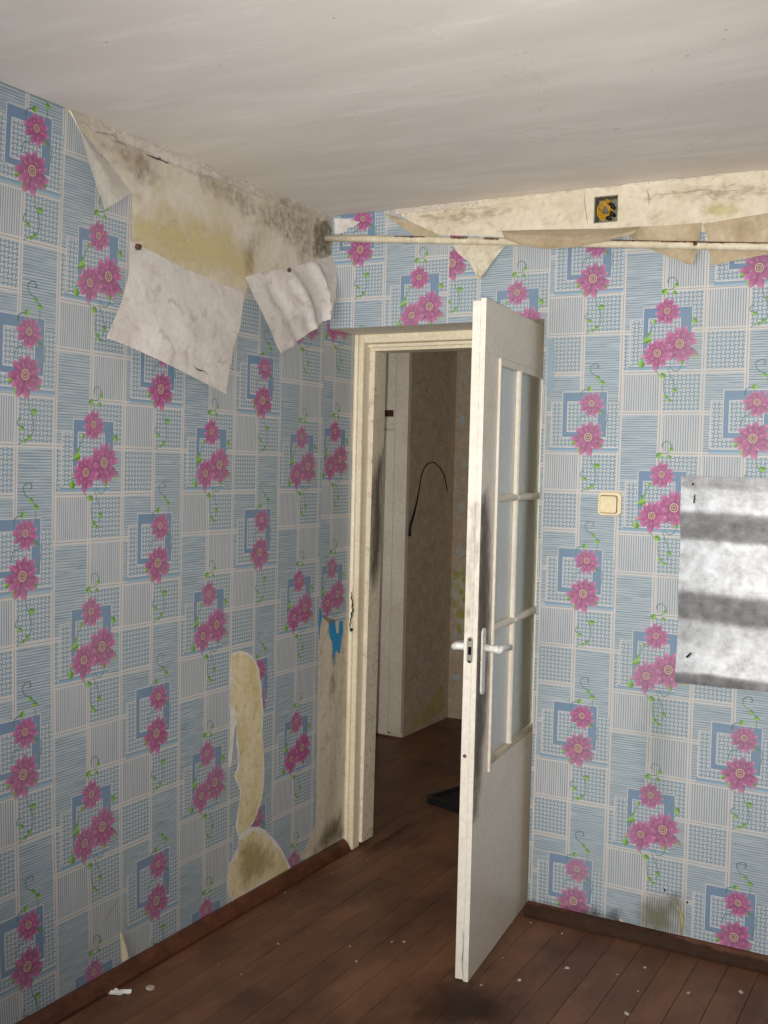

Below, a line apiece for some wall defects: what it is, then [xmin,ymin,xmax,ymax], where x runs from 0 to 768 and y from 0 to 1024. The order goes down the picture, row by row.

flaking render [64,107,332,301]
mould [272,210,332,257]
flaking render [392,169,768,238]
peeling [229,705,237,767]
flaking render [300,619,348,860]